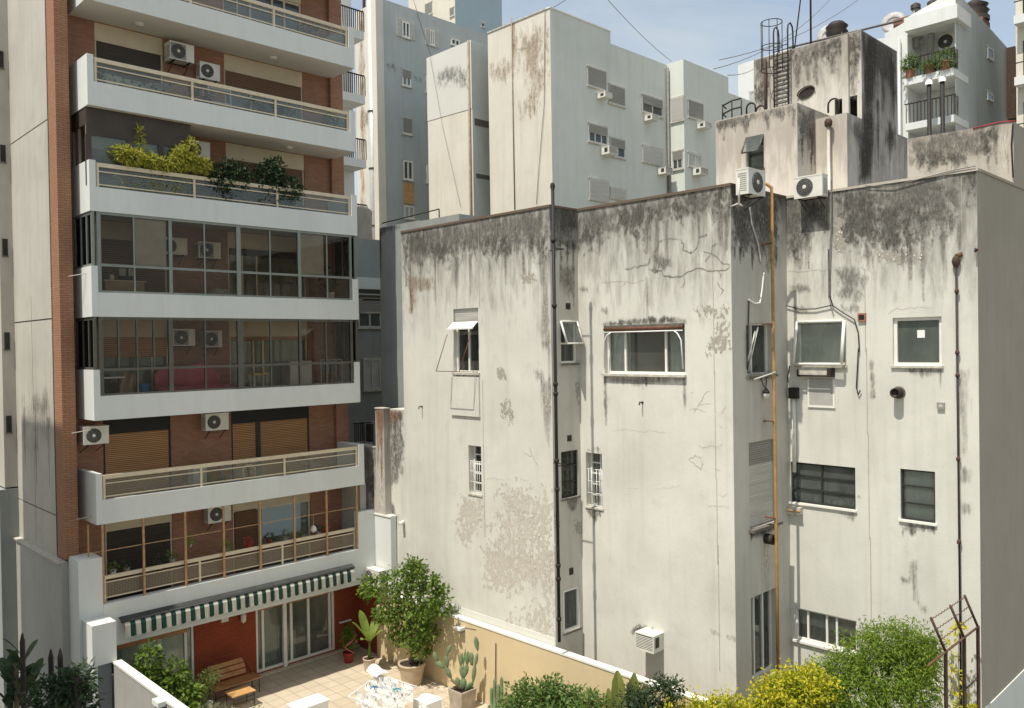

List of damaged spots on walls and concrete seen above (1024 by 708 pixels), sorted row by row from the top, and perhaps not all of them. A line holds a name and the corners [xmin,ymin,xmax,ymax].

water stain [716,37,897,179]
water stain [403,187,828,334]
crack [602,235,730,295]
peeling [693,304,732,357]
water stain [838,271,862,297]
water stain [837,127,1007,276]
peeling [454,477,560,647]